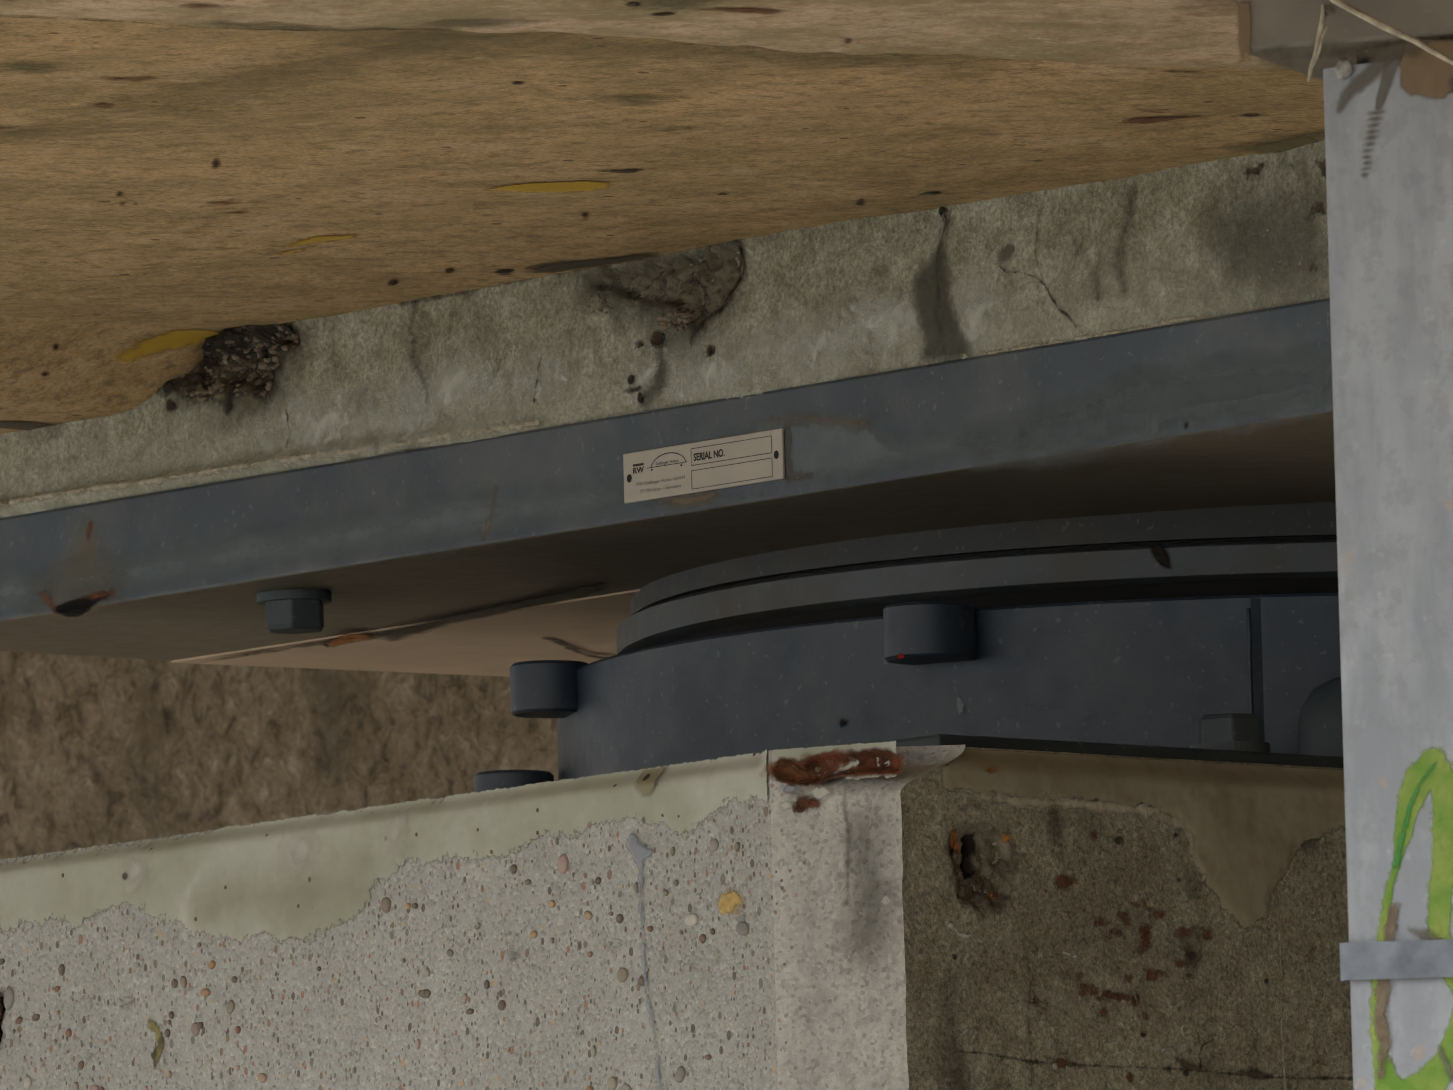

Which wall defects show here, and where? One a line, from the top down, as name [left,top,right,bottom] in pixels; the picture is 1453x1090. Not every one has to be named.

spalling [158,324,300,415]
spalling [584,239,745,345]
leakage [625,254,1006,406]
crack [998,246,1077,328]
corrosion [40,559,114,617]
peeling [0,741,904,944]
peeling [941,749,1346,929]
crack [962,1039,1353,1080]